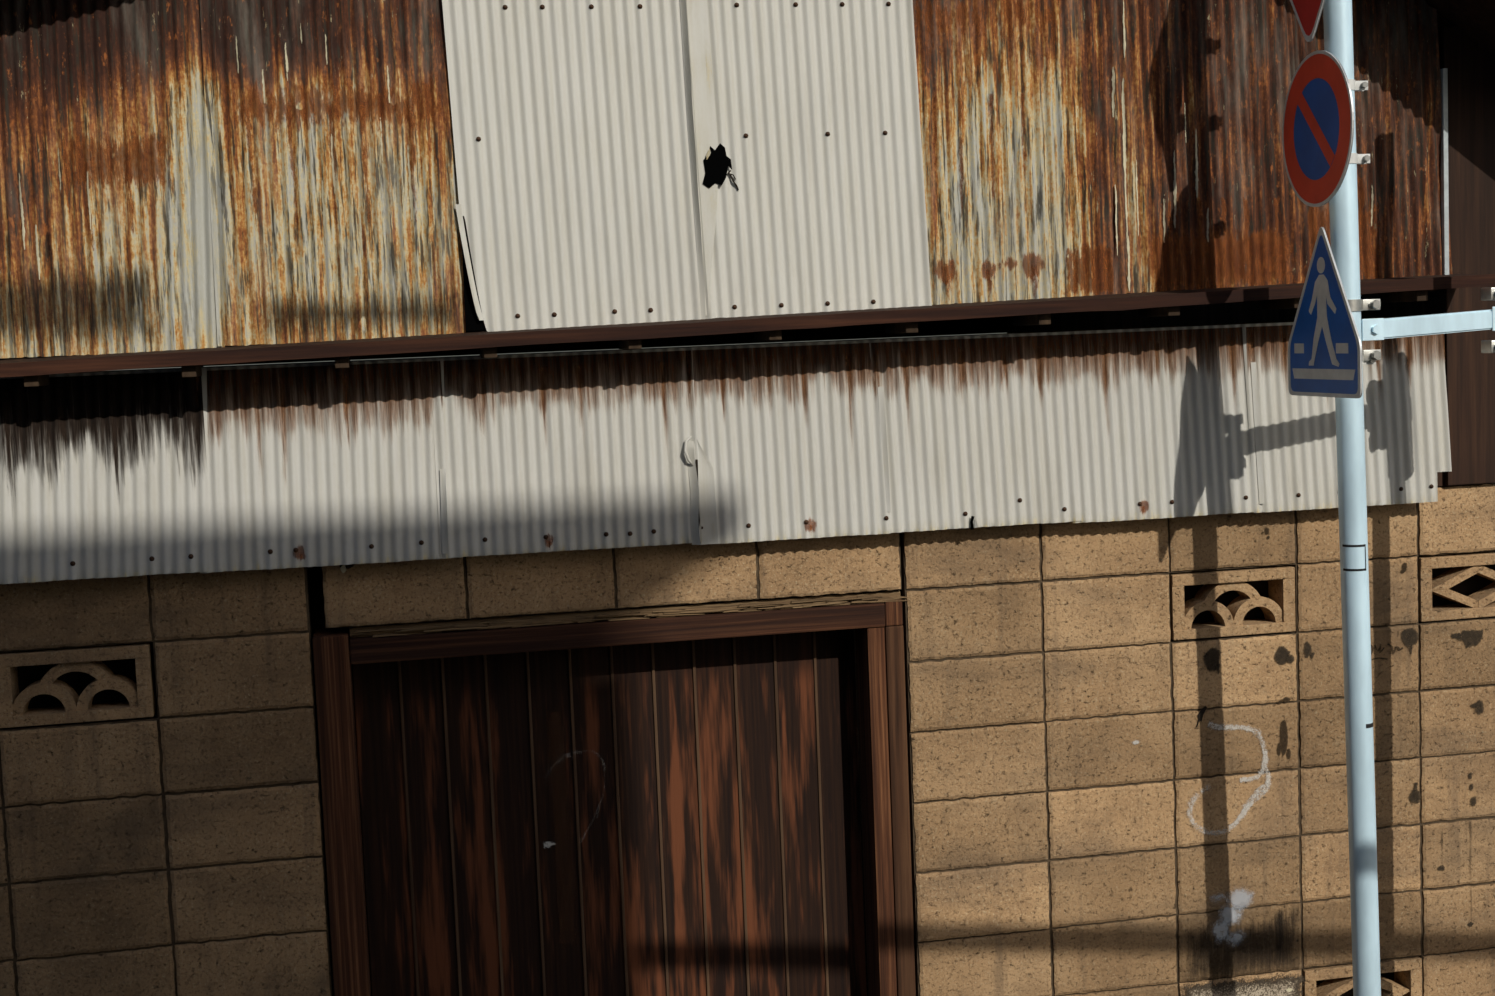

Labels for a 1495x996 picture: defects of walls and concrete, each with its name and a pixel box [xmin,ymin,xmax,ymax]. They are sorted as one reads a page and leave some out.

rust [61,125,173,232]
rust [222,73,448,223]
rust [934,259,957,296]
rust [915,0,1060,209]
rust [982,252,1044,297]
rust [1066,244,1114,297]
rust [1141,198,1330,292]
rust [1358,178,1382,279]